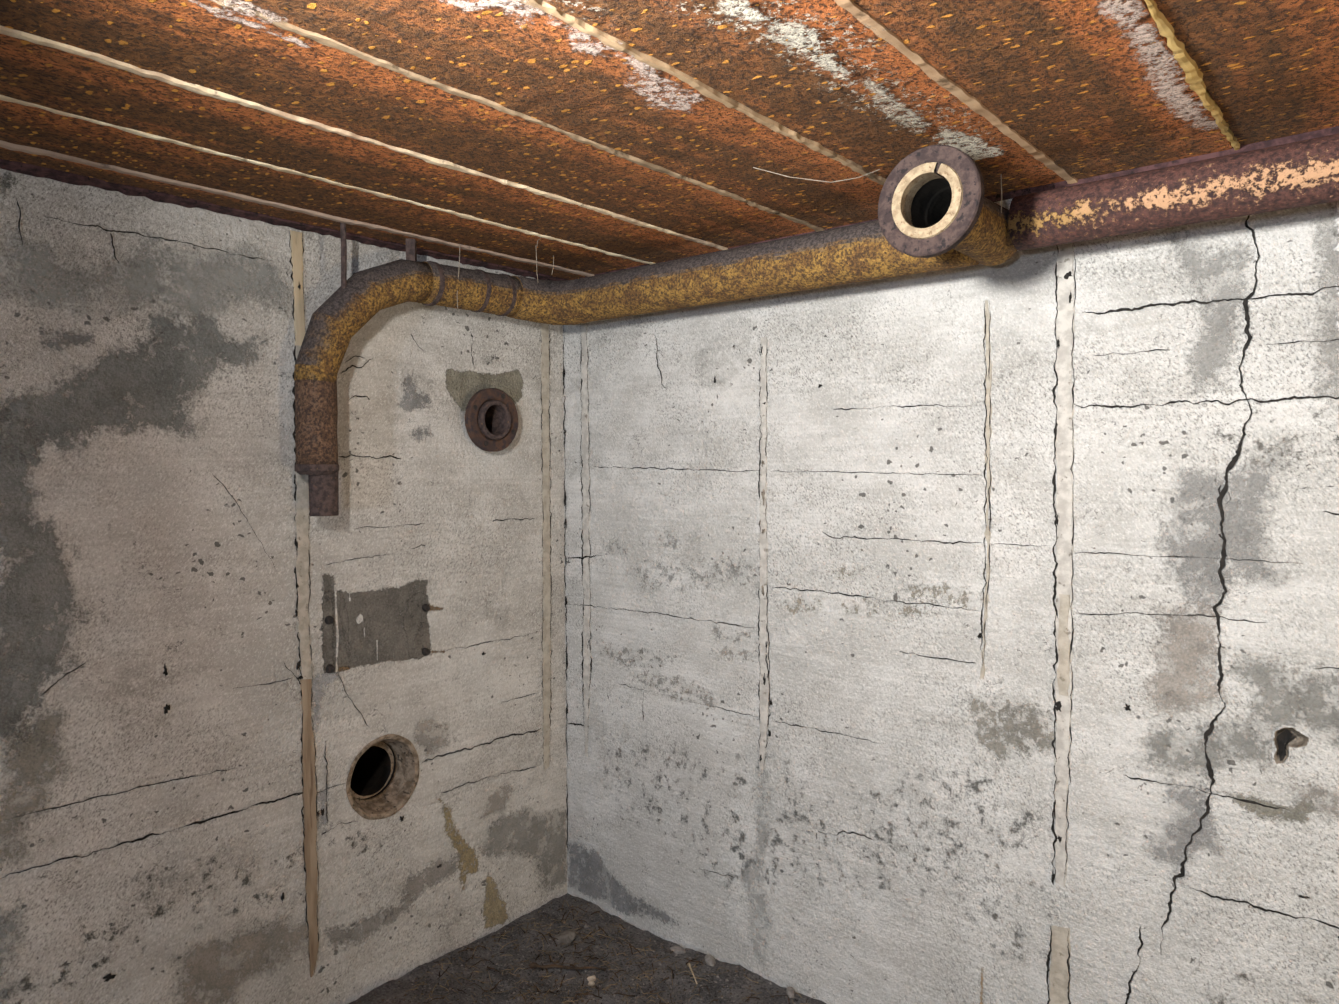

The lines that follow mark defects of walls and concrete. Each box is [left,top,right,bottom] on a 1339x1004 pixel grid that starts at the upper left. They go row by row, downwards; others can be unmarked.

water stain [1173,237,1251,385]
water stain [1314,201,1339,396]
water stain [0,311,265,860]
crack [1,201,425,977]
crack [422,215,1339,1004]
spalling [1273,727,1308,764]
corrosion [439,798,508,928]